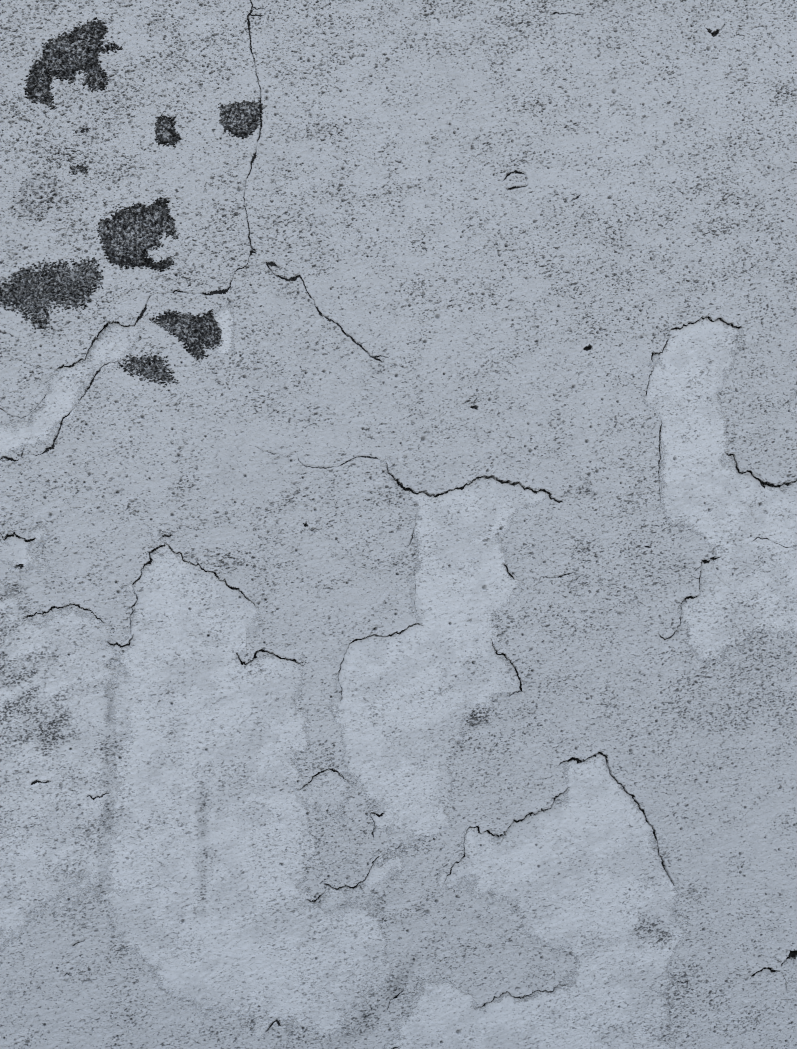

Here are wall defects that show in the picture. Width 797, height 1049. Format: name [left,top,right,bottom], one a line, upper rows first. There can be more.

crack [135,0,390,362]
flaking render [637,311,797,668]
flaking render [0,457,562,1044]
flaking render [384,746,689,1049]